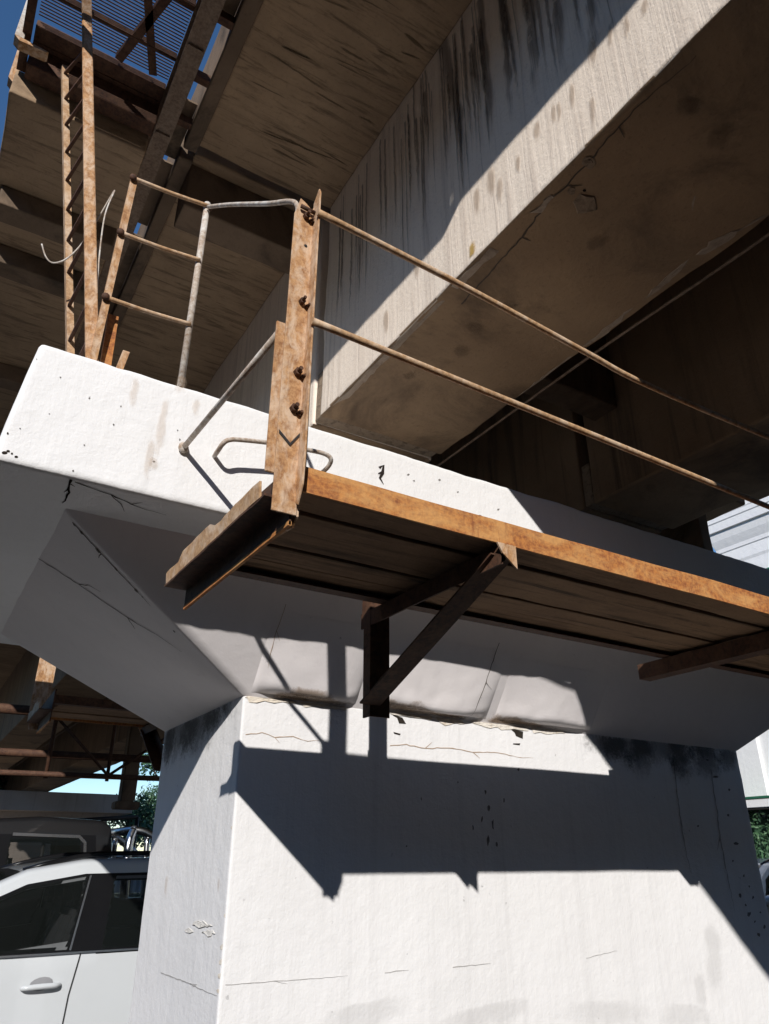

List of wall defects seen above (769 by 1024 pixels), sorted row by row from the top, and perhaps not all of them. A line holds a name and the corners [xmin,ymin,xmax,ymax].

crack [461,56,696,304]
crack [38,479,173,646]
crack [390,742,528,758]